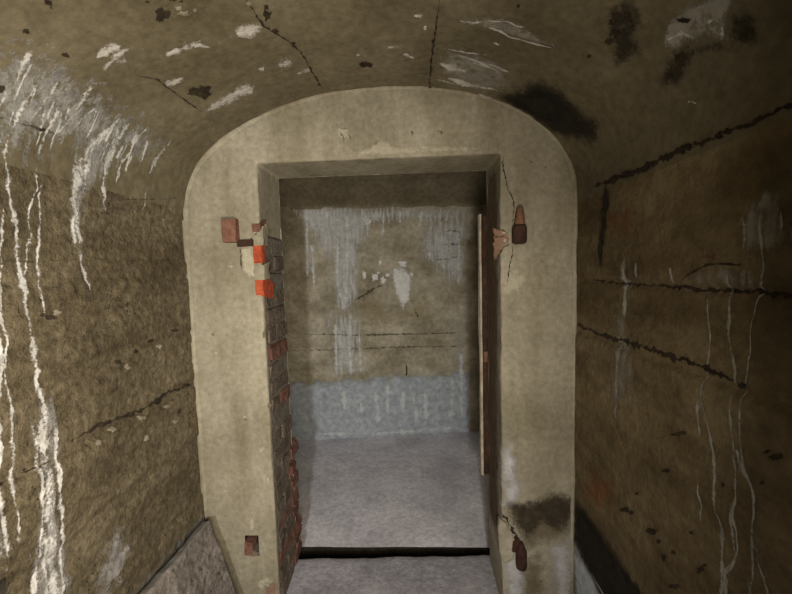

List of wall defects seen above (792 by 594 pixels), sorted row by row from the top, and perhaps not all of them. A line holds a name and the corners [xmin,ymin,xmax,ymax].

spalling [155,0,197,22]
crack [246,0,321,86]
damp [605,4,638,62]
hole [188,86,211,100]
crack [607,103,792,184]
damp [0,42,170,594]
spalling [242,248,254,276]
damp [287,207,472,444]
crack [578,323,746,389]
crack [597,263,792,299]
efflorescence [696,191,792,594]
damp [503,451,641,594]